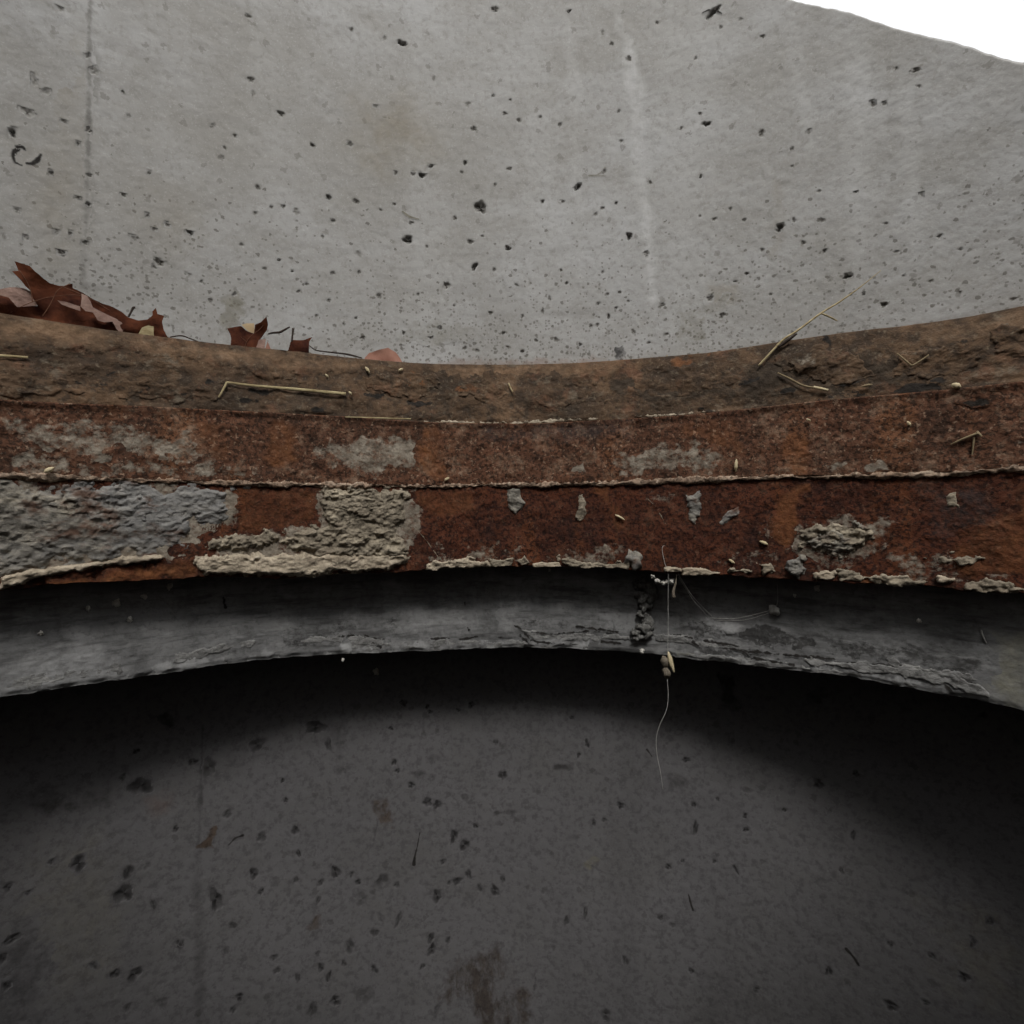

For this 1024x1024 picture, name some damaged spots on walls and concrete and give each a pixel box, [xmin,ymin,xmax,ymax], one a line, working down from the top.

rust [423,353,610,365]
rust [670,352,713,369]
rust [411,423,486,523]
peeling [47,484,196,531]
rust [235,486,322,535]
rust [589,486,634,539]
rust [766,479,813,549]
rust [948,479,1024,588]
peeling [0,554,164,590]
rust [43,552,200,584]
peeling [193,550,411,579]
peeling [654,633,990,697]